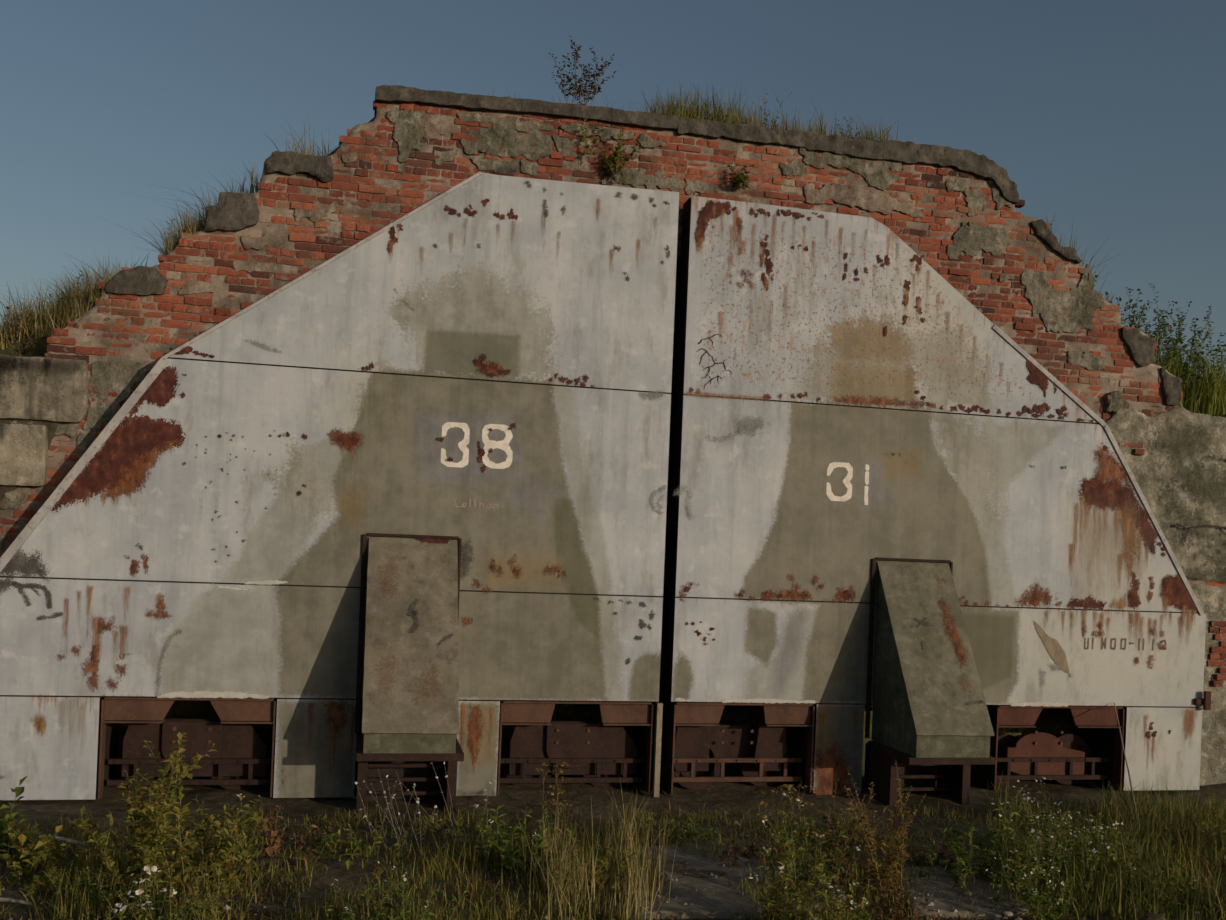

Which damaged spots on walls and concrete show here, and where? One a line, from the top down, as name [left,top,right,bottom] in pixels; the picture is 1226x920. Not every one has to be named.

peeling [387,110,666,220]
peeling [601,147,924,251]
rust [713,206,787,291]
peeling [843,253,890,281]
peeling [998,264,1105,333]
peeling [915,360,1129,423]
rust [938,443,1198,669]
rust [59,587,127,691]
rust [145,593,171,618]
flaking render [1207,621,1226,687]
rust [461,704,493,765]
rust [1144,709,1197,758]